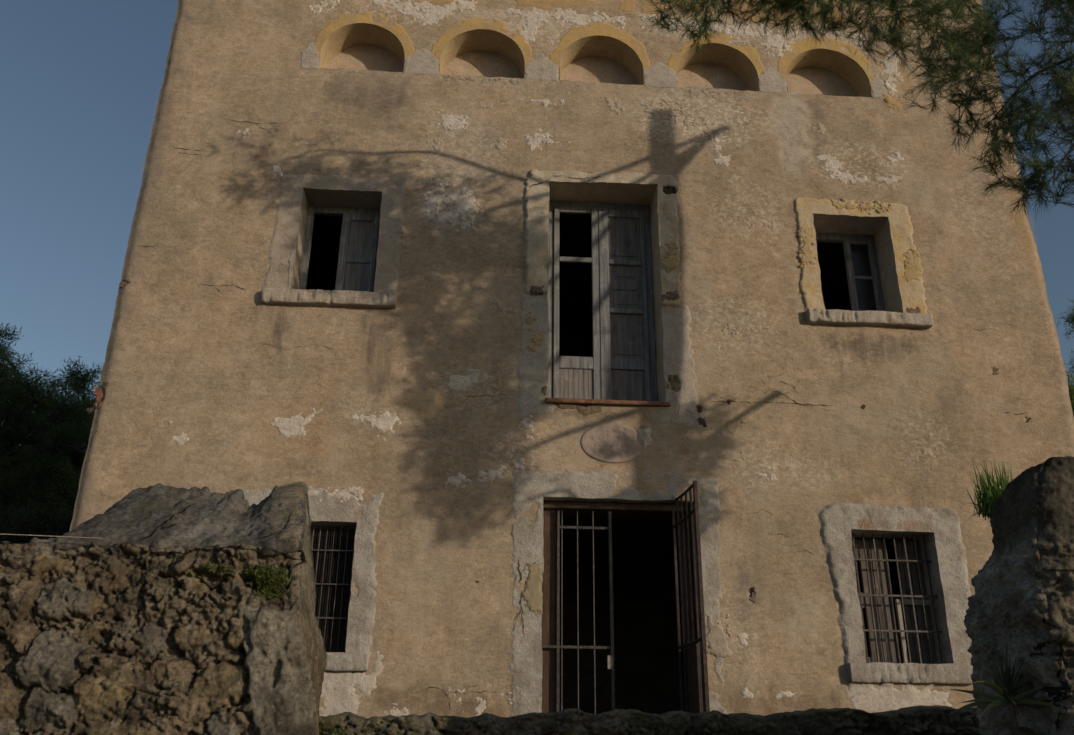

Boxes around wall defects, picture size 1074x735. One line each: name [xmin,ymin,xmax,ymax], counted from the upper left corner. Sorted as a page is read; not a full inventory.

peeling [370,0,477,26]
peeling [502,5,625,43]
peeling [638,14,869,57]
peeling [877,50,904,112]
peeling [813,150,904,214]
peeling [415,183,484,231]
crack [674,372,831,414]
peeling [271,408,323,438]
peeling [351,409,401,441]
peeling [308,486,364,503]
crack [514,559,537,637]
peeling [319,651,384,717]